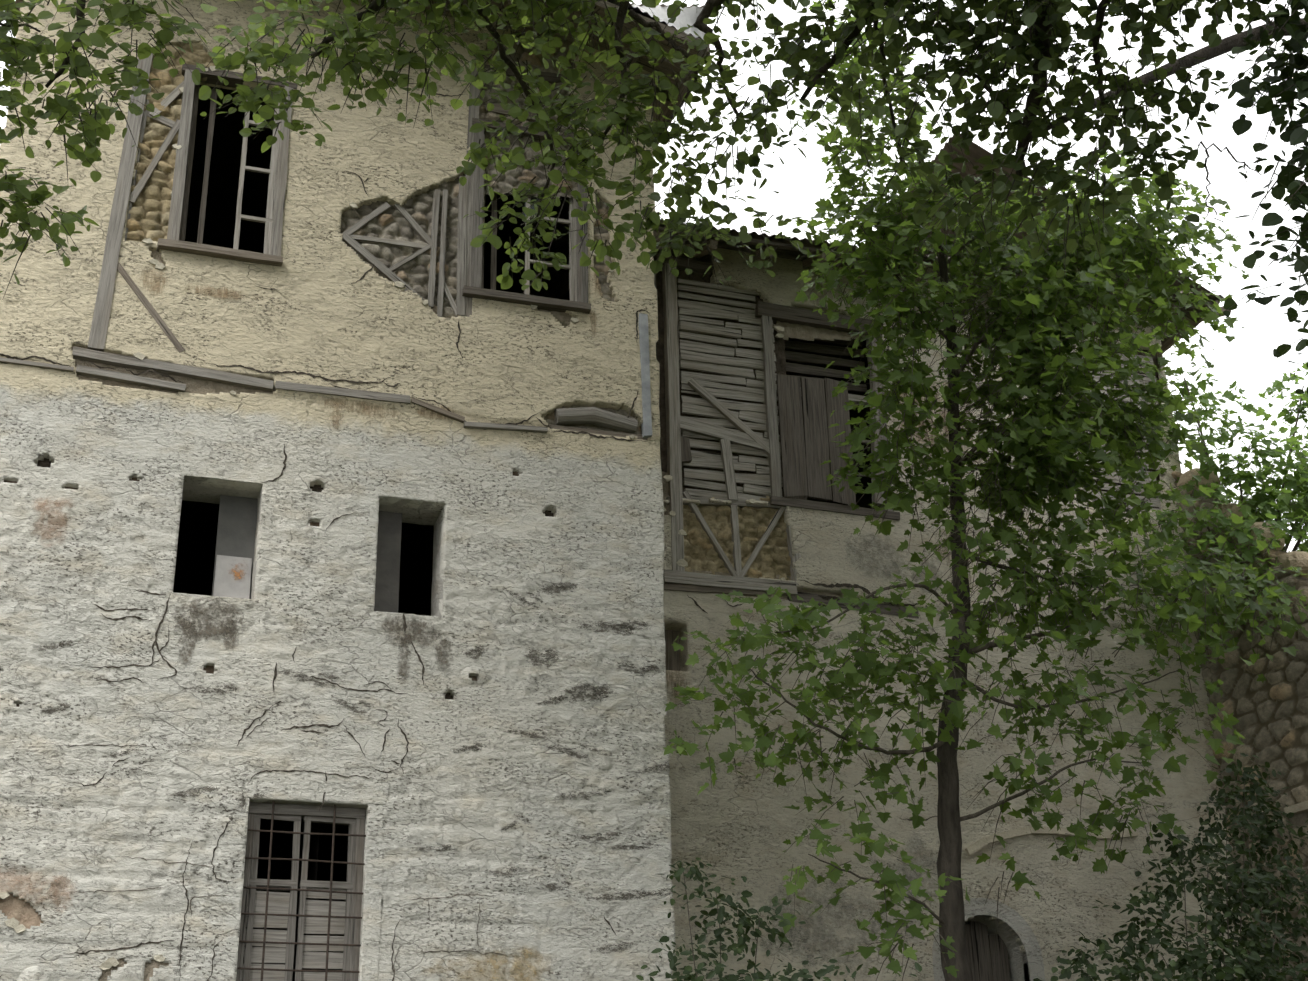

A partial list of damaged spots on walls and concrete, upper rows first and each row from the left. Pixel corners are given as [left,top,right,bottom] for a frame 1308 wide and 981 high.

flaking render [126,41,218,270]
flaking render [340,29,578,318]
crack [0,353,646,442]
flaking render [544,248,865,600]
crack [81,590,177,683]
leakage [175,598,242,663]
leakage [382,617,450,677]
crack [237,613,425,811]
crack [52,743,159,786]
flaking render [0,892,43,934]
crack [45,818,233,981]
flaking render [98,957,127,981]